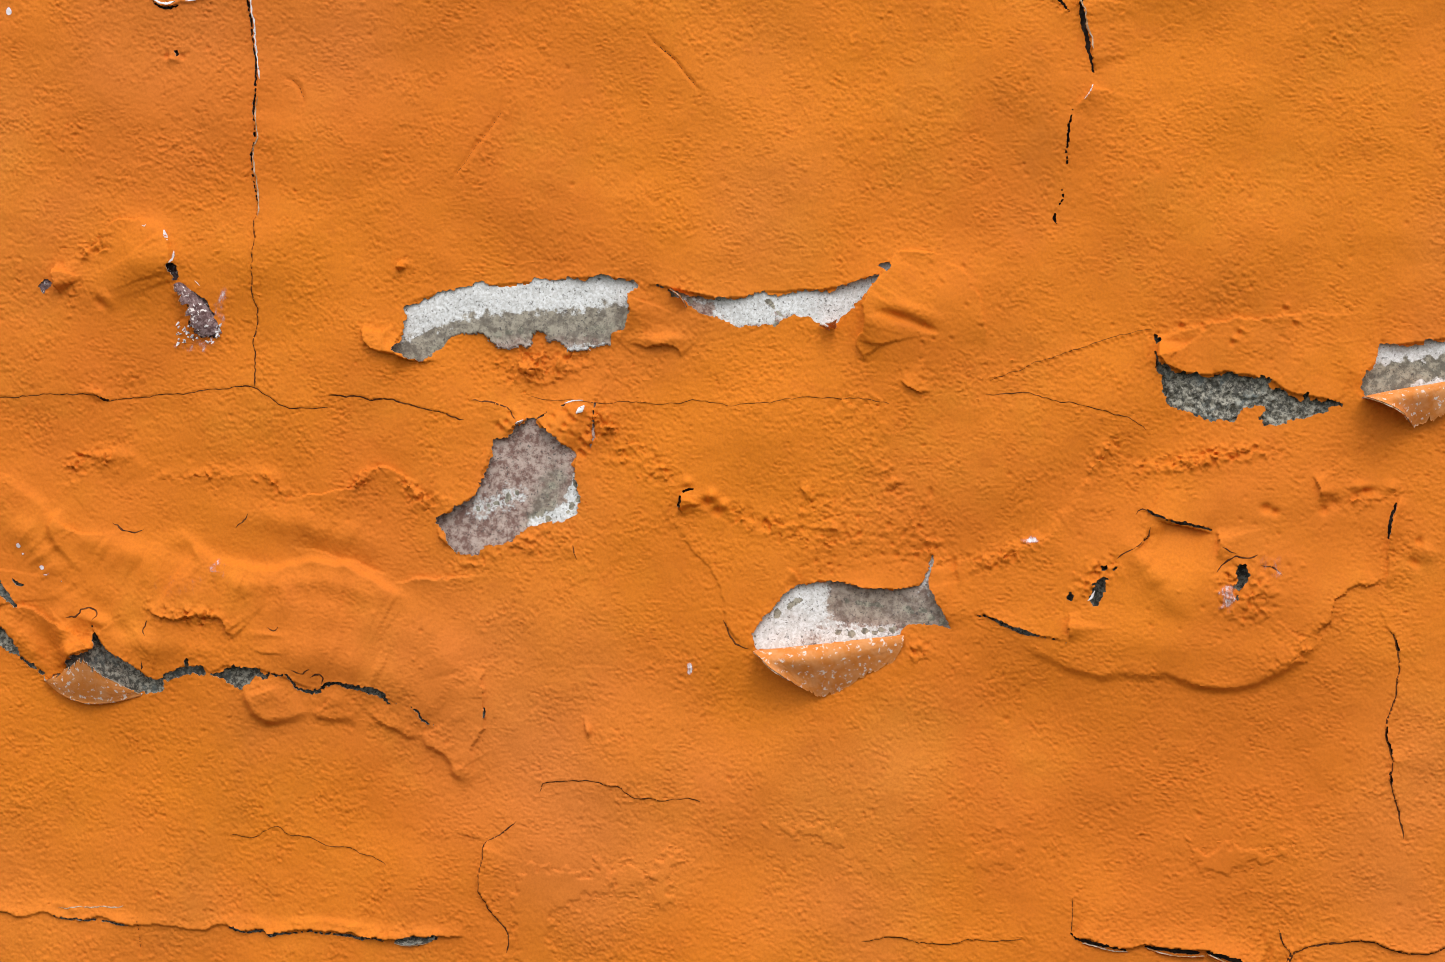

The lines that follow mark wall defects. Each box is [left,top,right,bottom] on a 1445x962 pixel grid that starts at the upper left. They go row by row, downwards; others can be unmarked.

crack [1052,0,1102,224]
crack [0,0,894,426]
peeling [352,248,997,572]
peeling [1149,301,1445,435]
peeling [723,548,962,704]
crack [1369,488,1412,846]
crack [536,776,707,807]
crack [0,822,515,959]
crack [858,932,1027,950]
crack [1063,901,1445,962]